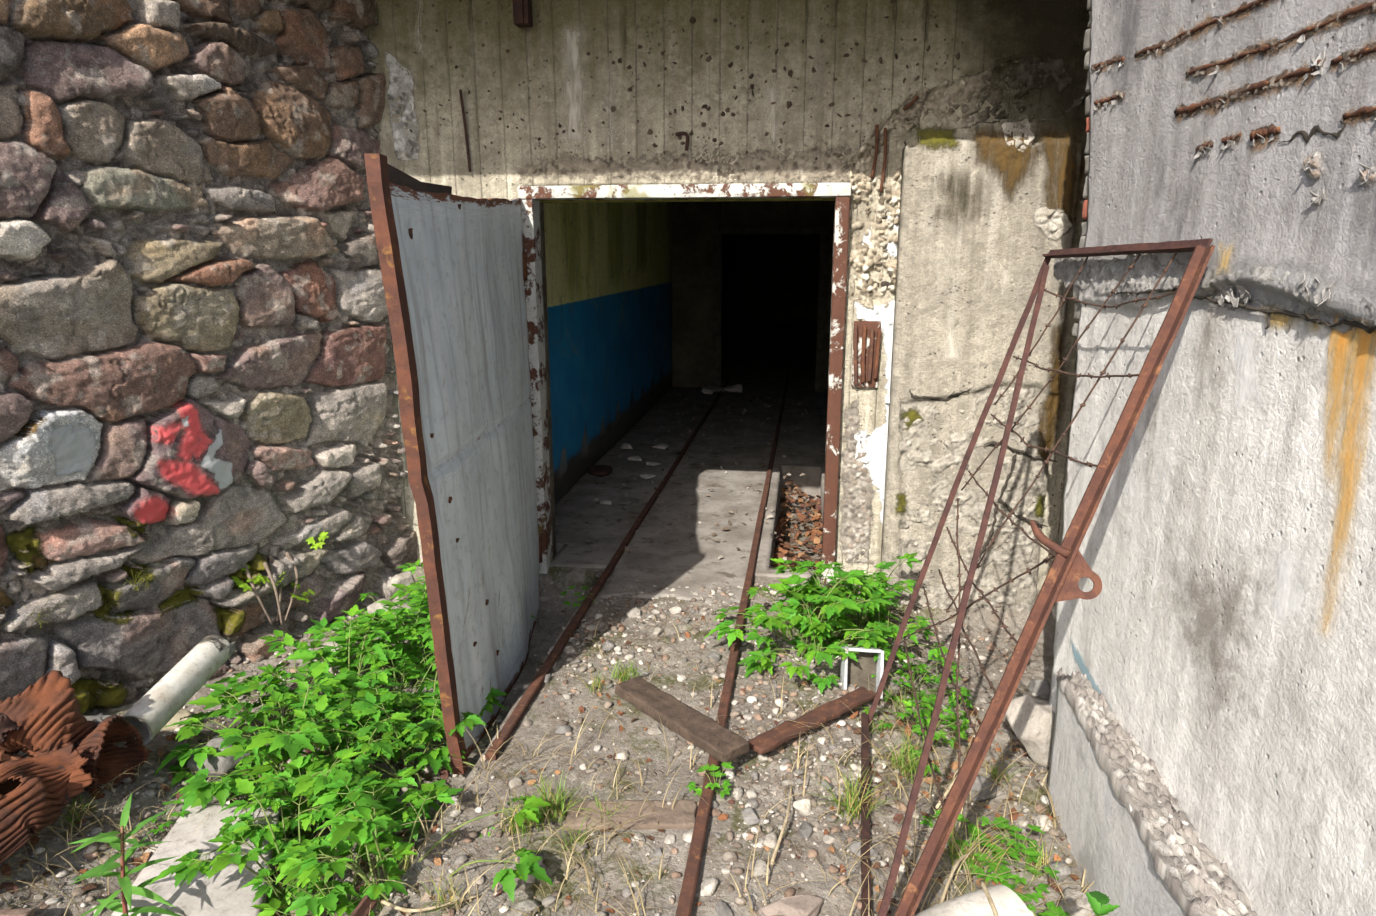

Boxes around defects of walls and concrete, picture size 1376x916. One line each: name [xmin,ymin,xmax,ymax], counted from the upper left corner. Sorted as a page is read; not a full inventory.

spalling [1091,0,1284,73]
spalling [1185,1,1376,78]
water stain [961,0,1091,171]
spalling [1193,124,1281,159]
spalling [1174,41,1376,120]
crack [1278,121,1346,144]
spalling [1342,106,1376,123]
spalling [1357,163,1376,186]
spalling [518,11,1125,614]
crack [1107,285,1376,334]
crack [909,388,971,402]
corrosion [1314,316,1376,571]